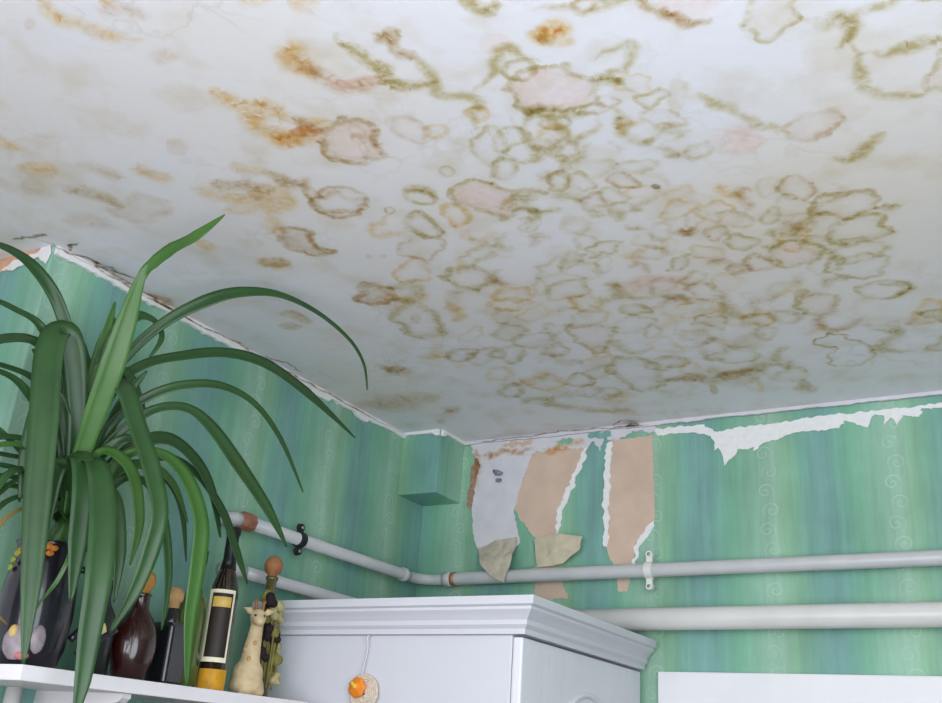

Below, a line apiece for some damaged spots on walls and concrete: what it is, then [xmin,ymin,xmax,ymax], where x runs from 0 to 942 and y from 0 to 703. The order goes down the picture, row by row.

flaking render [0,249,40,272]
flaking render [502,439,589,539]
flaking render [606,435,655,565]
flaking render [534,581,568,600]
flaking render [617,578,630,592]